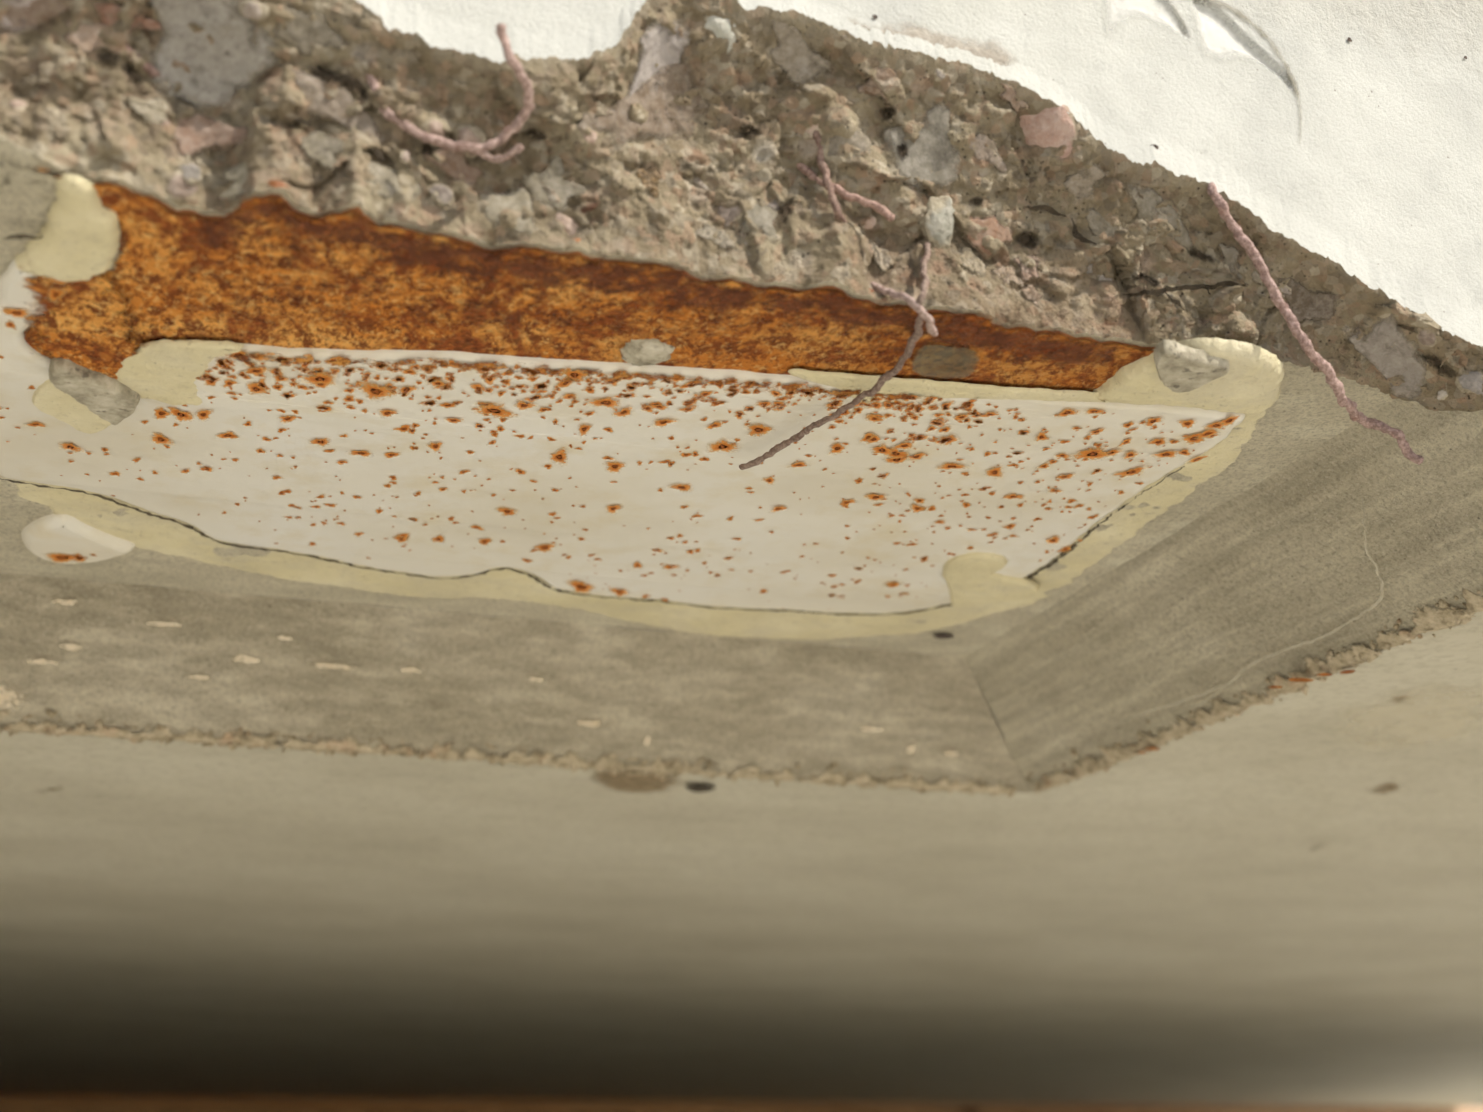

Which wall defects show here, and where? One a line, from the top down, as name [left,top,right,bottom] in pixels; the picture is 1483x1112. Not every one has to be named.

rust [4,185,1239,601]
peeling [0,259,1245,613]
spalling [0,0,1483,412]
spalling [0,589,1483,798]